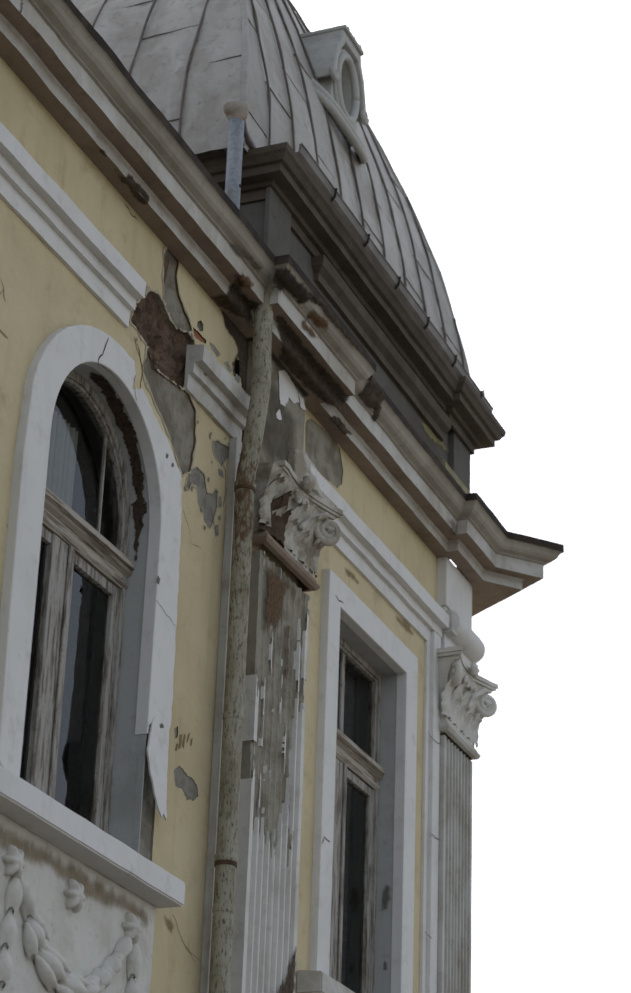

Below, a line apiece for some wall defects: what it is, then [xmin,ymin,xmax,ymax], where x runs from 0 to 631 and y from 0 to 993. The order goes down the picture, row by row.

peeling [90,373,147,560]
crack [98,338,149,400]
flaking render [130,246,241,536]
flaking render [276,370,343,488]
rust [266,568,294,685]
peeling [240,550,308,866]
peeling [139,714,198,861]
flaking render [277,952,297,993]